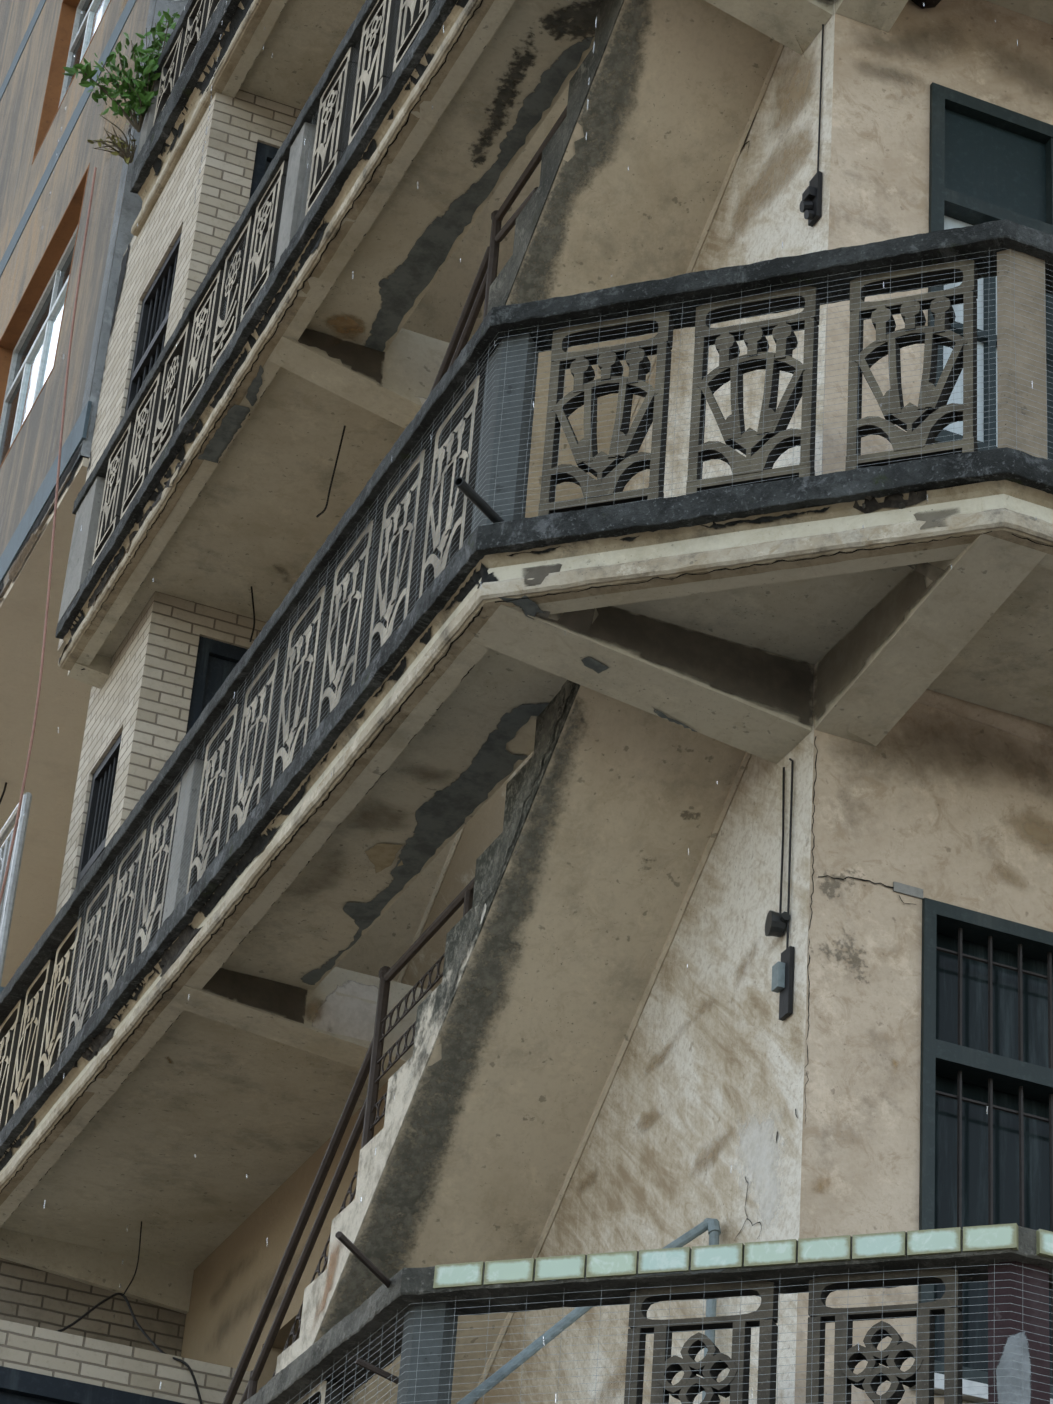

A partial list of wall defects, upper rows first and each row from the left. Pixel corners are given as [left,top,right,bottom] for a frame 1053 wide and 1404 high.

damp [471,0,602,167]
peeling [301,703,550,985]
peeling [312,981,379,1042]